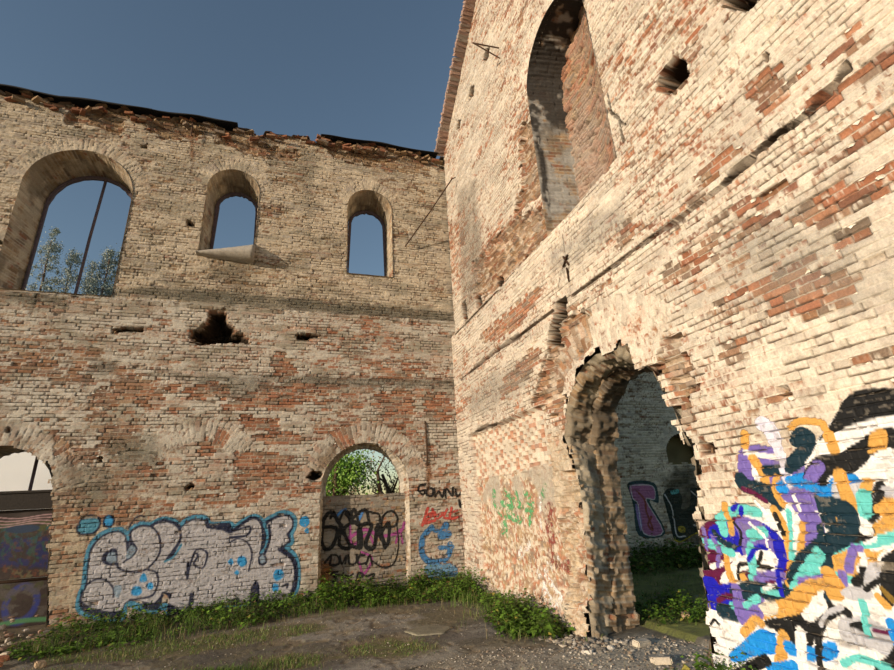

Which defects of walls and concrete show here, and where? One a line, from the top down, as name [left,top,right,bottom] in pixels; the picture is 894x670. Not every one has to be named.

peeling [743,20,873,117]
peeling [799,43,894,114]
spalling [190,307,252,346]
spalling [649,332,701,432]